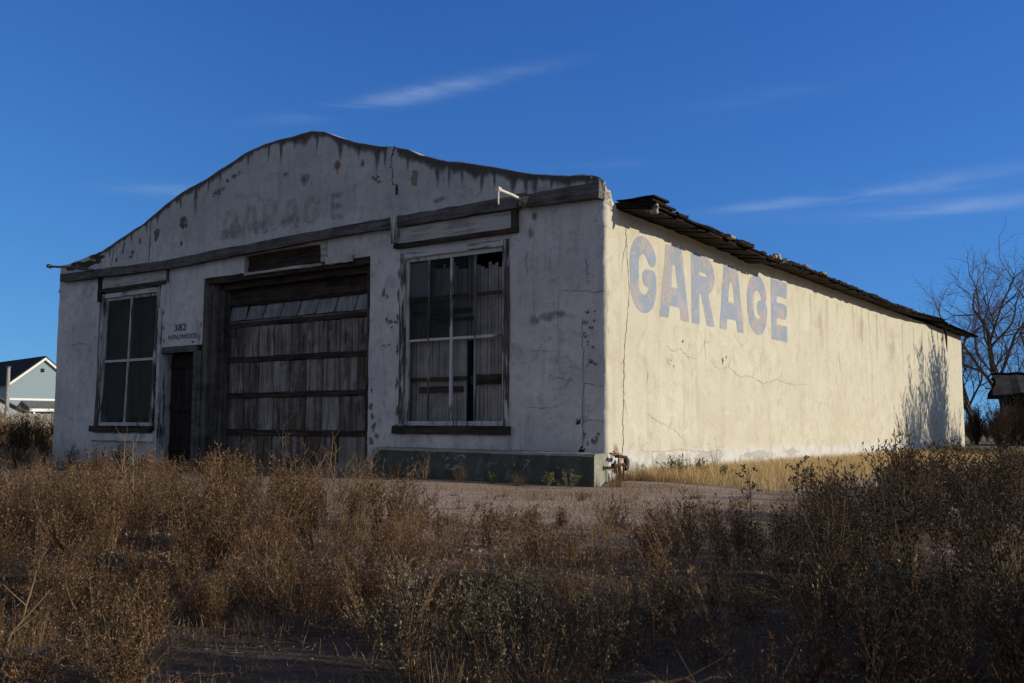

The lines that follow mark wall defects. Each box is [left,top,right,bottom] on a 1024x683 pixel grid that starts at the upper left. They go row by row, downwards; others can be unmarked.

damp [90,131,598,259]
crack [389,146,398,195]
crack [532,235,712,461]